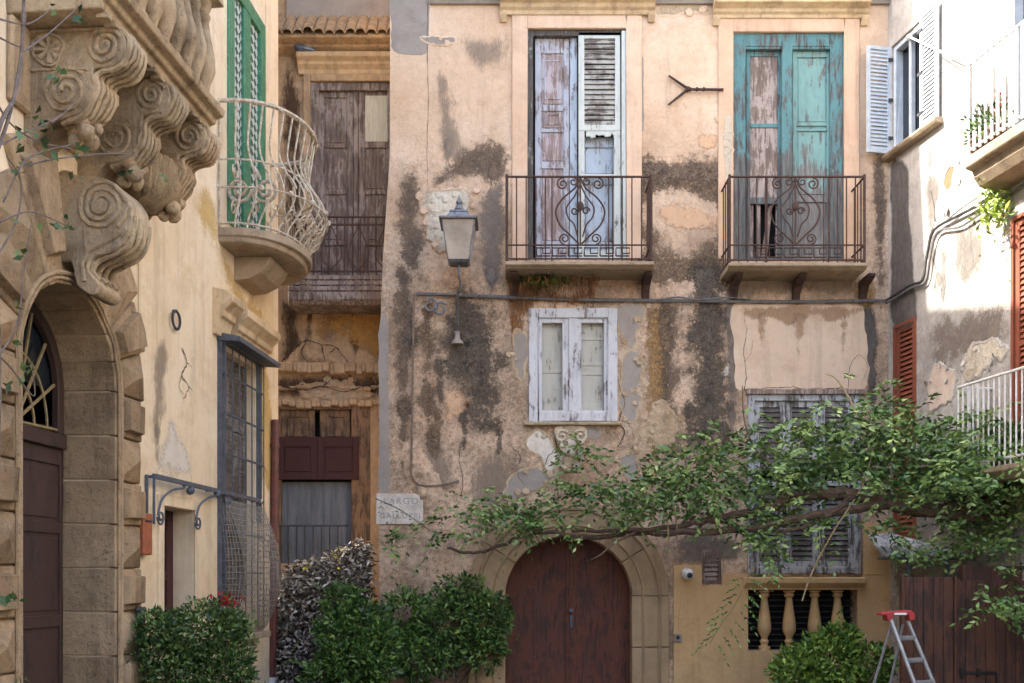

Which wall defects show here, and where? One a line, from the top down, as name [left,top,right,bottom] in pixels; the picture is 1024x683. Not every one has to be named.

flaking render [419,35,457,47]
spalling [415,179,480,254]
leakage [871,110,917,328]
leakage [434,76,509,454]
leakage [637,155,737,474]
crack [179,349,190,400]
crack [280,339,379,392]
flaking render [613,298,684,494]
leakage [744,304,878,406]
flaking render [924,337,1010,414]
flaking render [502,428,564,506]